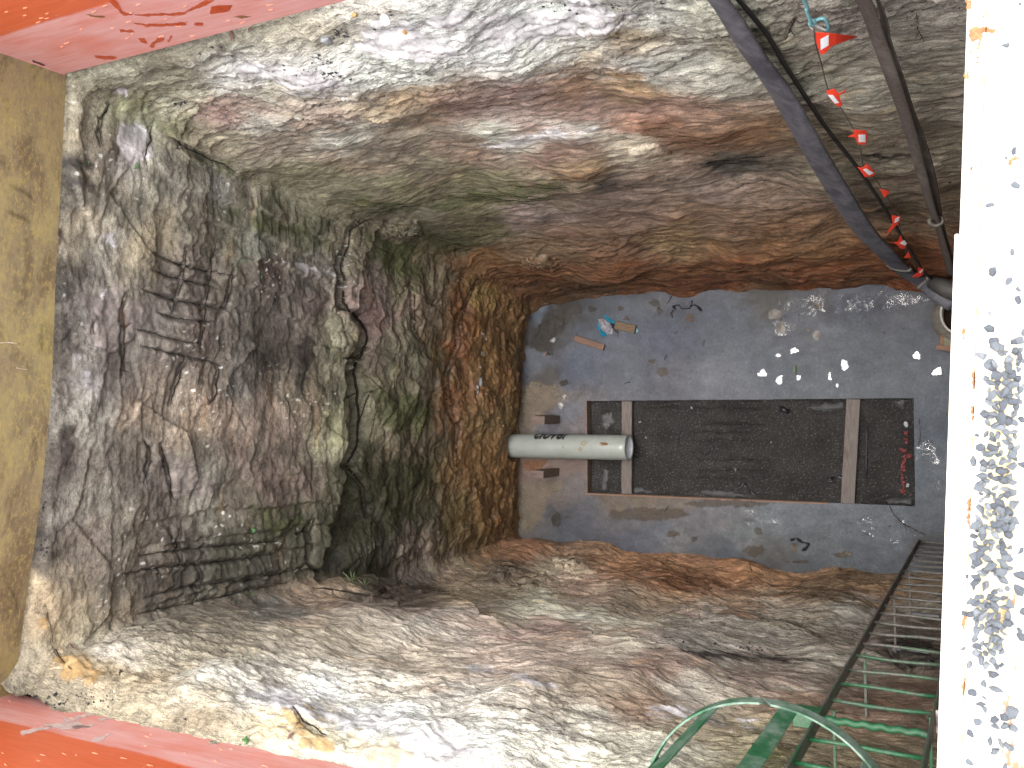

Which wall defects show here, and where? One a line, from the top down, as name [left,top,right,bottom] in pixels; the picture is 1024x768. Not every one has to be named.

rust [963,26,996,79]